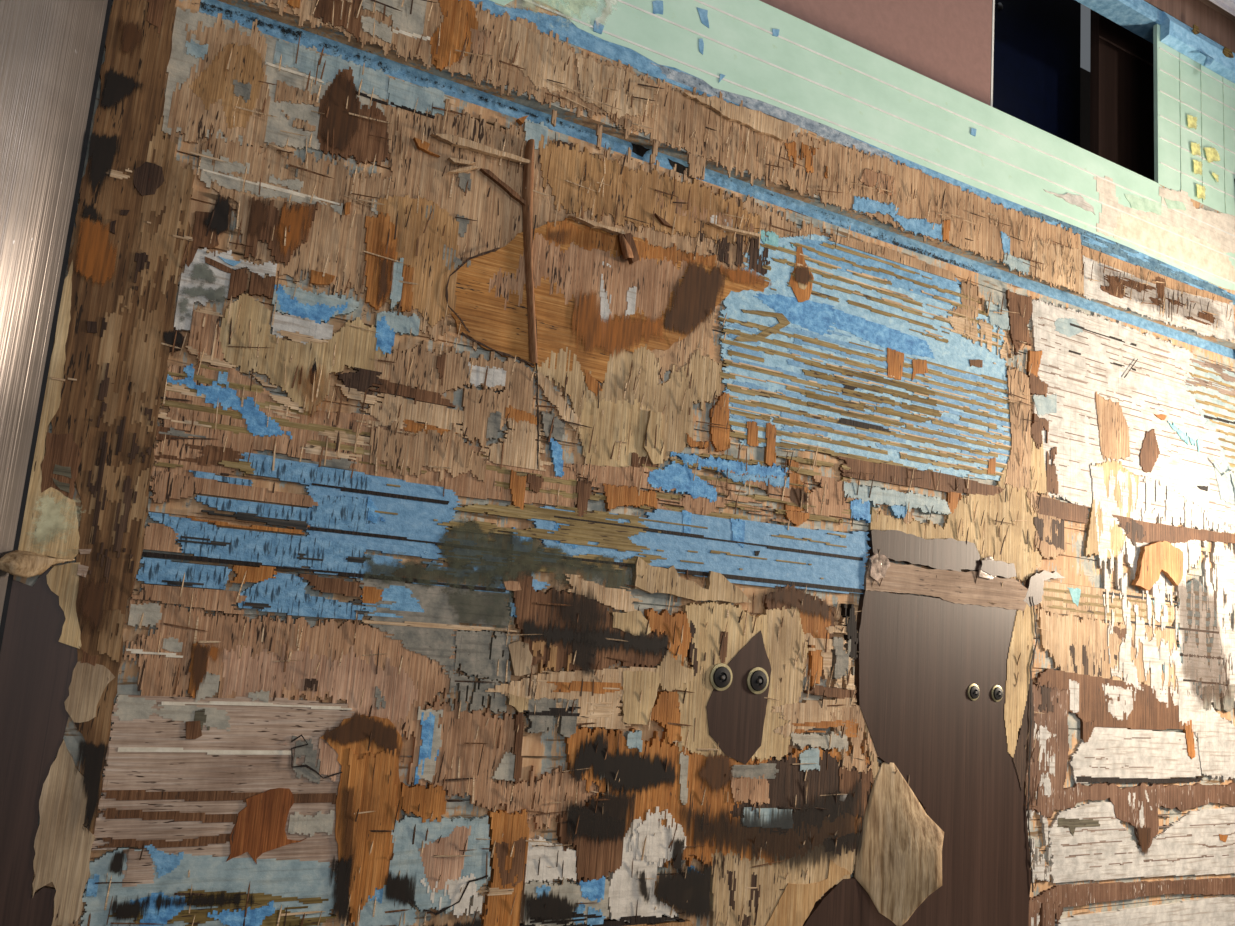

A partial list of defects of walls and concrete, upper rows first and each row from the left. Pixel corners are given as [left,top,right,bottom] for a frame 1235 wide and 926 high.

peeling [189,42,320,132]
peeling [314,0,362,43]
peeling [509,20,657,119]
peeling [173,235,277,362]
peeling [376,195,459,328]
peeling [489,134,761,321]
peeling [369,353,537,482]
peeling [578,369,665,473]
peeling [828,176,1235,784]
peeling [64,642,418,881]
peeling [854,762,944,926]
peeling [1027,802,1235,926]